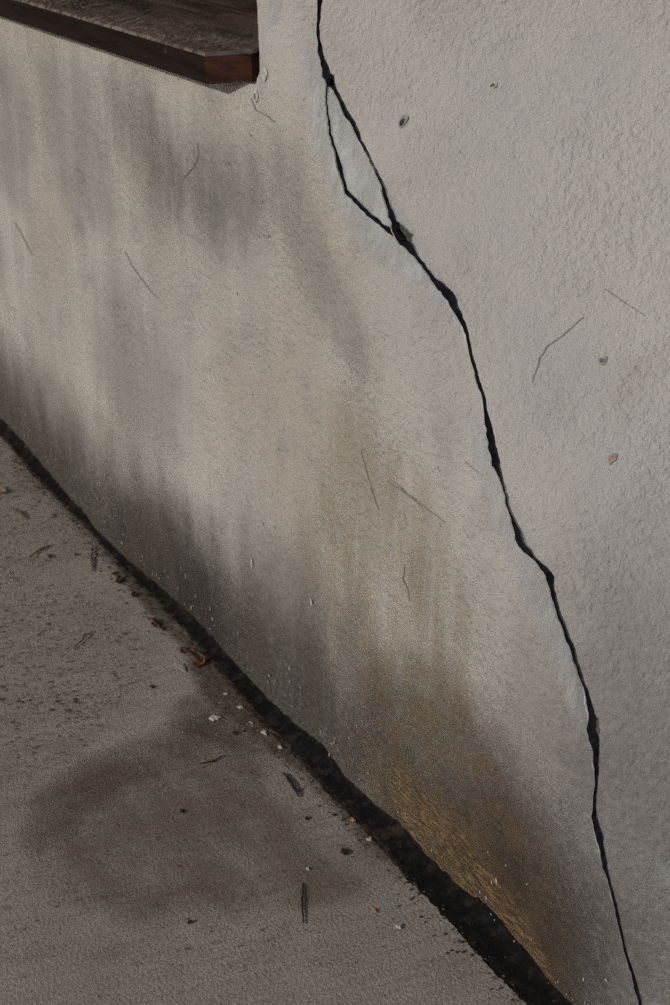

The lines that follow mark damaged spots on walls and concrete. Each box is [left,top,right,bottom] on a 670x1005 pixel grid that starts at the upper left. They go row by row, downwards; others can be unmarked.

damp [0,362,213,635]
crack [316,0,642,1005]
damp [416,767,670,1005]